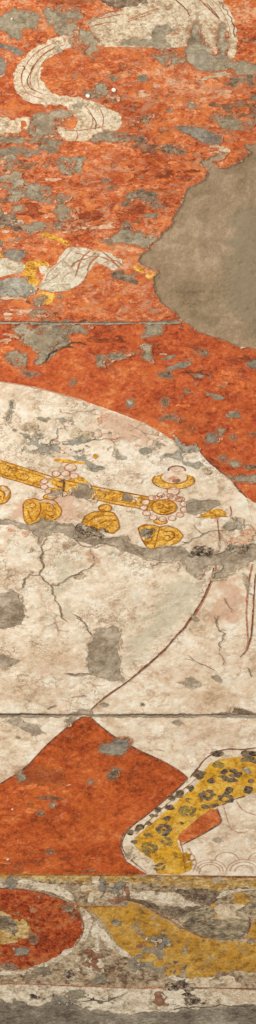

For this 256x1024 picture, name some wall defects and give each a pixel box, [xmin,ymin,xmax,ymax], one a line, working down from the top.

flaking render [0,6,99,77]
flaking render [0,22,256,262]
flaking render [0,277,256,484]
flaking render [5,518,106,574]
flaking render [121,528,171,548]
flaking render [0,549,28,628]
crack [21,538,122,636]
flaking render [86,625,126,682]
peeling [161,903,245,922]
peeling [127,933,256,1007]